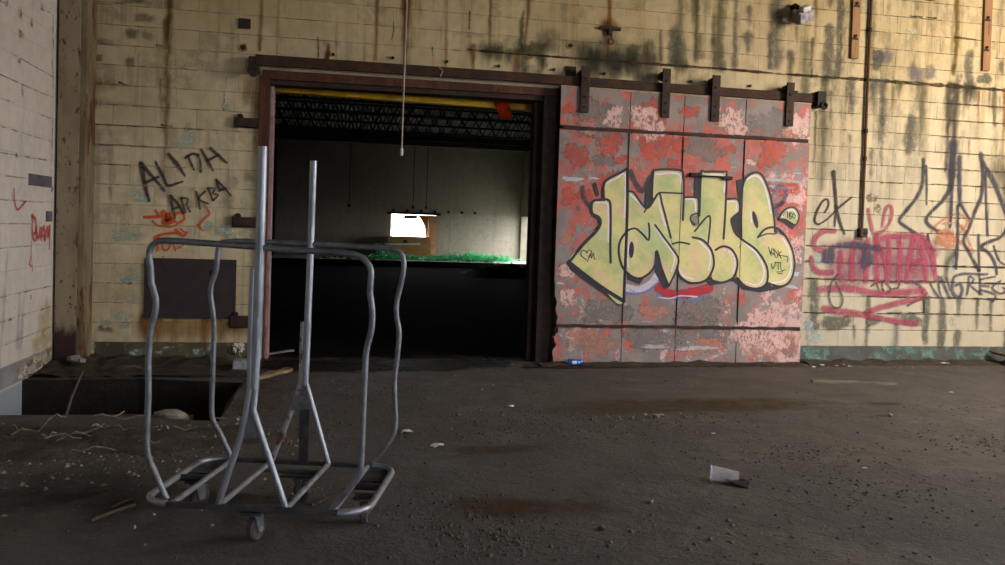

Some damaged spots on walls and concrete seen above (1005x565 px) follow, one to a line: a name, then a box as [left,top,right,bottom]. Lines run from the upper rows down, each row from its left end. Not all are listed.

leakage [485,18,545,73]
rust [602,0,613,42]
leakage [578,0,699,74]
leakage [714,0,753,68]
leakage [803,0,854,145]
leakage [873,50,892,70]
leakage [871,80,885,139]
leakage [898,67,935,153]
leakage [945,51,1004,180]